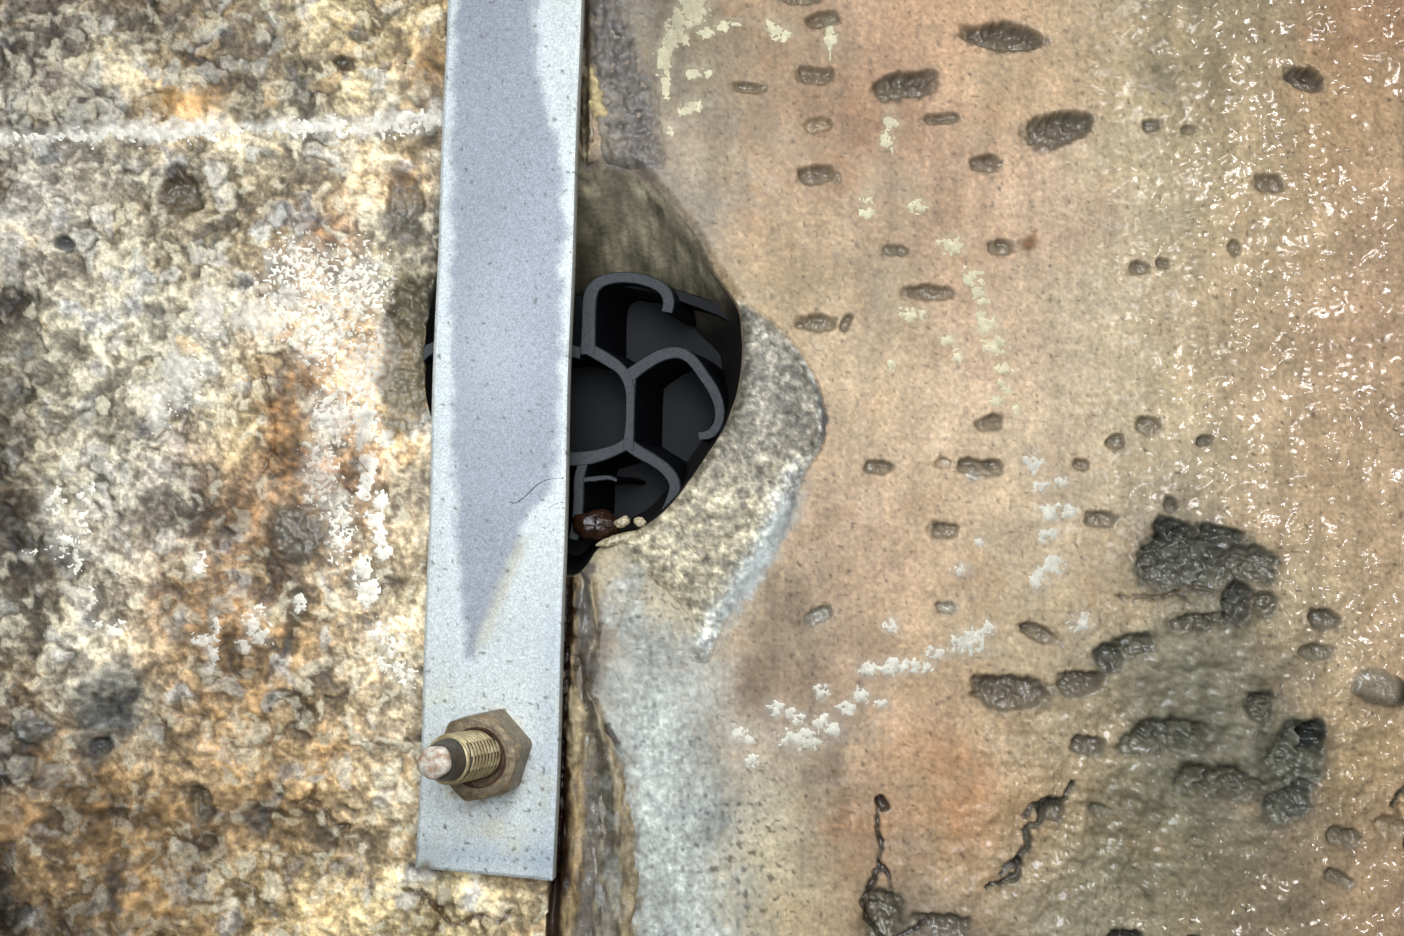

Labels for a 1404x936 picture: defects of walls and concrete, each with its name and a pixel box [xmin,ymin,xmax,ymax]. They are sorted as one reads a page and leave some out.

leakage [765,19,792,42]
leakage [823,26,838,61]
leakage [652,0,741,136]
leakage [0,104,443,150]
spalling [795,315,852,333]
spalling [614,516,647,528]
leakage [765,619,995,751]
leakage [732,726,759,768]
crack [1390,787,1404,807]
crack [985,780,1075,890]
crack [859,808,929,936]